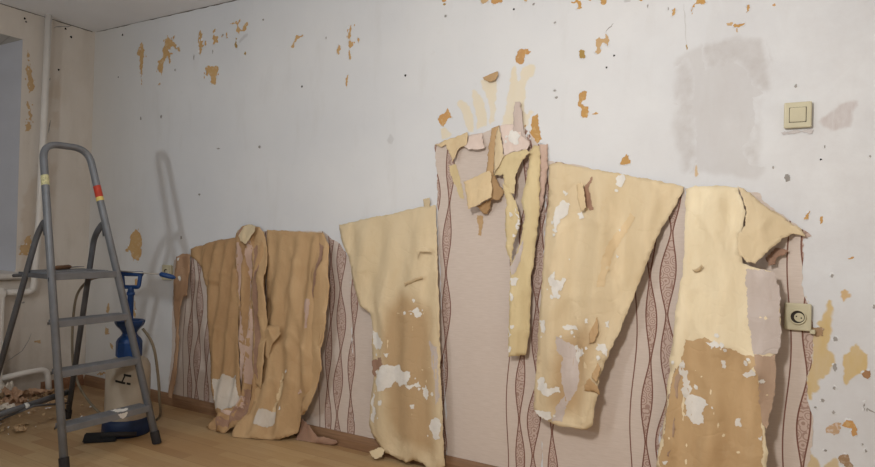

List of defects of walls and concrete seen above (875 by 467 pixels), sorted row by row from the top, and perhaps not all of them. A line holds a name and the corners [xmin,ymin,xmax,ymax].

peeling [193,19,248,61]
peeling [24,49,35,131]
peeling [137,42,147,85]
peeling [156,35,180,86]
peeling [204,65,219,85]
peeling [437,108,453,128]
peeling [515,48,531,64]
peeling [524,114,543,144]
peeling [578,89,598,118]
peeling [125,228,142,261]
flaking render [810,327,839,343]